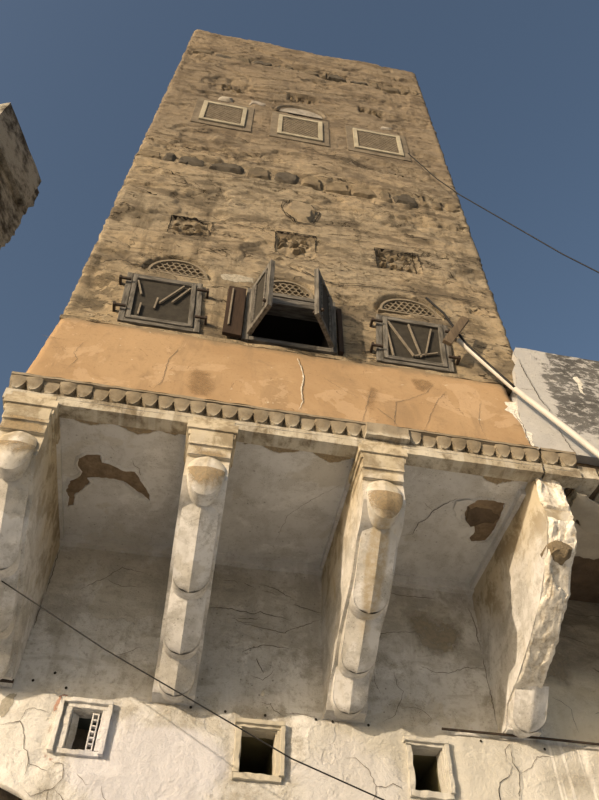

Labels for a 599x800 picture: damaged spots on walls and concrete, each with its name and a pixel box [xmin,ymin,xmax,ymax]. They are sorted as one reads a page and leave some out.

crack [297,358,305,405]
flaking render [63,452,154,508]
flaking render [453,497,509,543]
crack [210,574,319,680]
crack [423,611,497,724]
peeling [0,694,17,717]
crack [1,708,106,800]
crack [499,744,553,800]